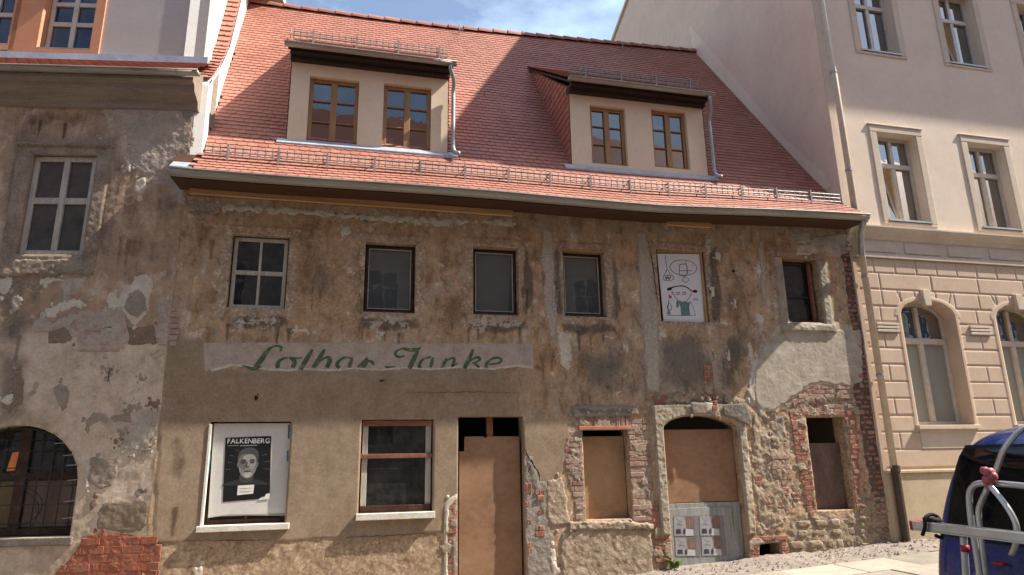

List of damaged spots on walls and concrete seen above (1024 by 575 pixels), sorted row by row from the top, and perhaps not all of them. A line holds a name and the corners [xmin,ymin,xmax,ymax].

flaking render [30,274,179,382]
flaking render [110,397,161,459]
flaking render [439,494,458,575]
flaking render [524,456,561,575]
flaking render [564,411,672,563]
flaking render [653,229,892,558]